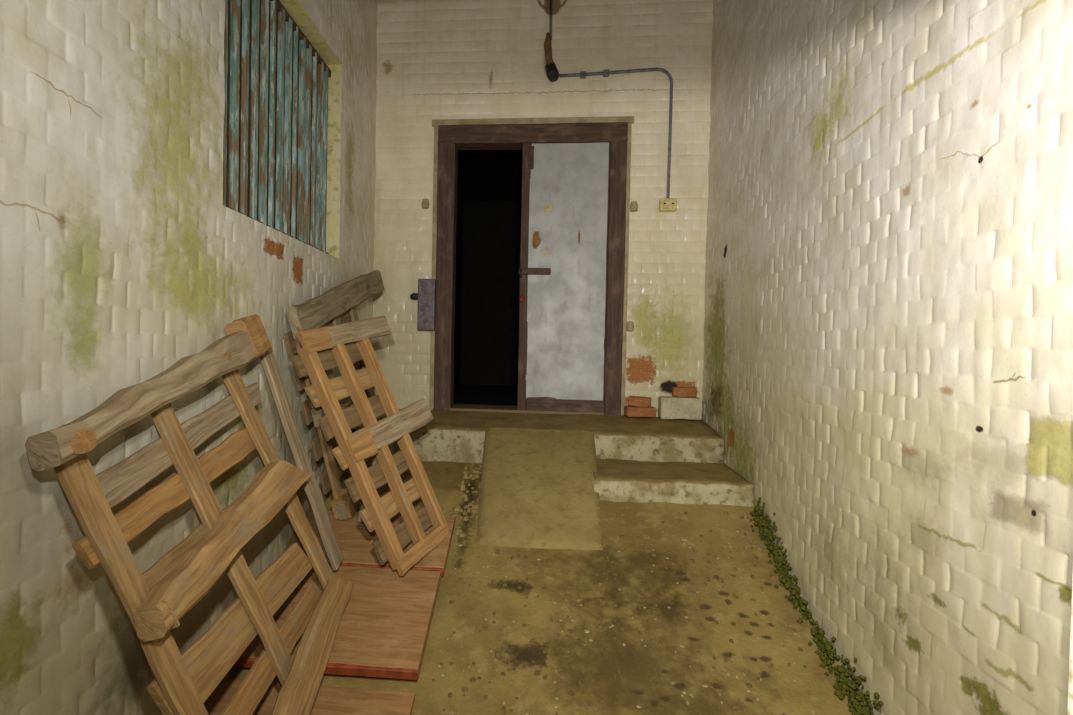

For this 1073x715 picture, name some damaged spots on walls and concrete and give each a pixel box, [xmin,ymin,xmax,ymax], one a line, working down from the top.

crack [39,76,99,116]
crack [0,201,60,230]
peeling [263,238,303,285]
spalling [626,355,657,385]
peeling [1026,419,1073,484]